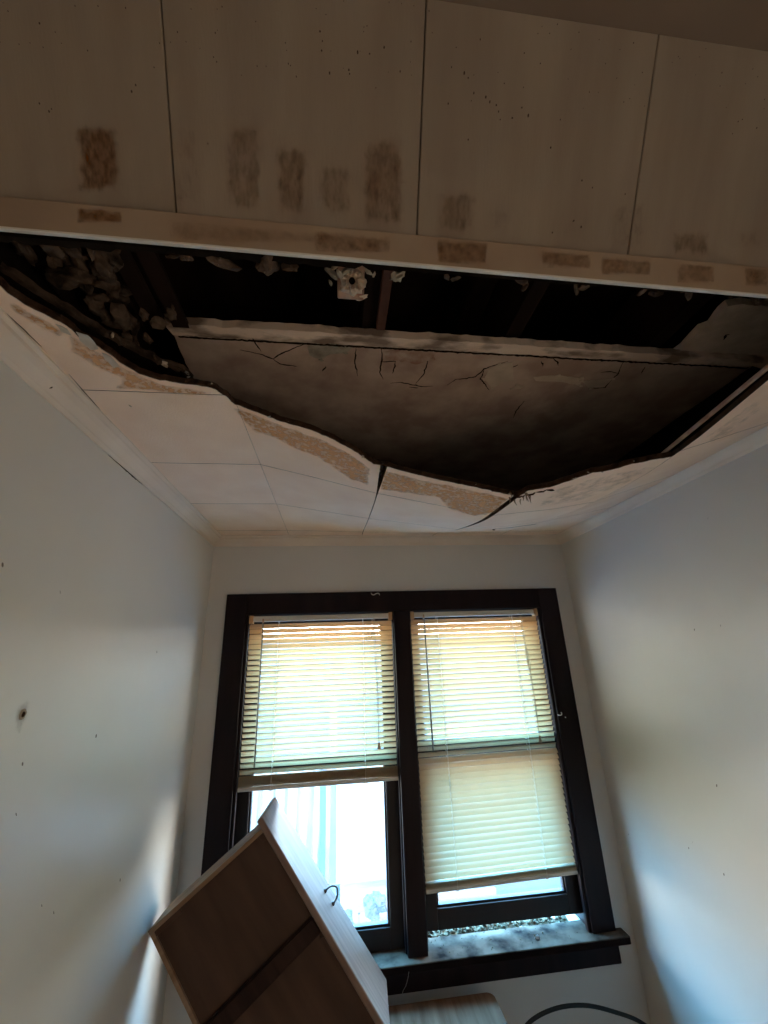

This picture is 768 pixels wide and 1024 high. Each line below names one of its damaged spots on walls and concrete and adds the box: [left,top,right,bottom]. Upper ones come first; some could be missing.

spalling [0,231,736,383]
crack [242,339,302,367]
crack [354,349,559,390]
crack [377,461,385,489]
crack [480,497,535,530]